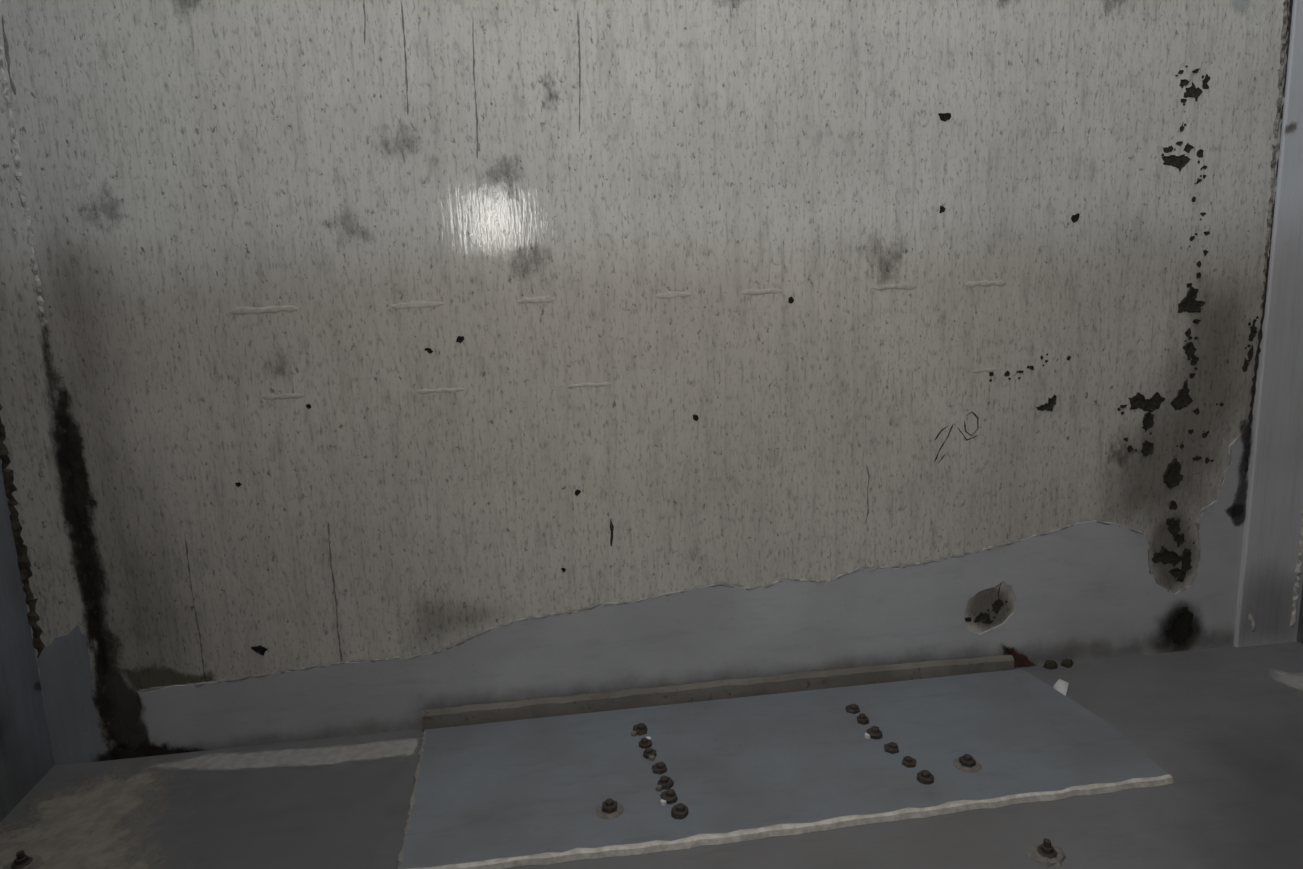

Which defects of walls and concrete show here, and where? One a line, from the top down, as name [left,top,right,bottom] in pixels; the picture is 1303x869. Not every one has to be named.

spalling [1175,65,1210,106]
water stain [43,325,201,762]
peeling [136,123,1255,752]
spalling [1242,316,1259,372]